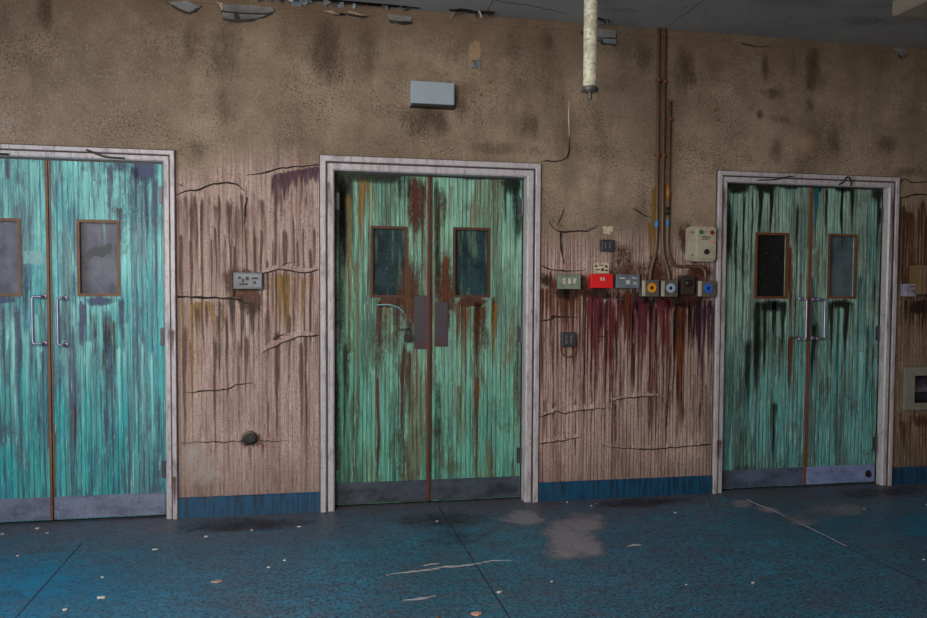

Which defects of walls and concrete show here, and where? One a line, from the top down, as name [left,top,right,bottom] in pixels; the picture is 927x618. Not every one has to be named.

peeling [165,1,201,15]
peeling [216,0,420,25]
crack [261,259,319,274]
crack [177,295,253,305]
rust [373,177,426,470]
rust [540,188,711,442]
water stain [901,295,927,338]
crack [262,325,319,353]
rust [435,256,495,471]
crack [187,383,257,393]
crack [539,345,671,452]
crack [180,438,286,446]